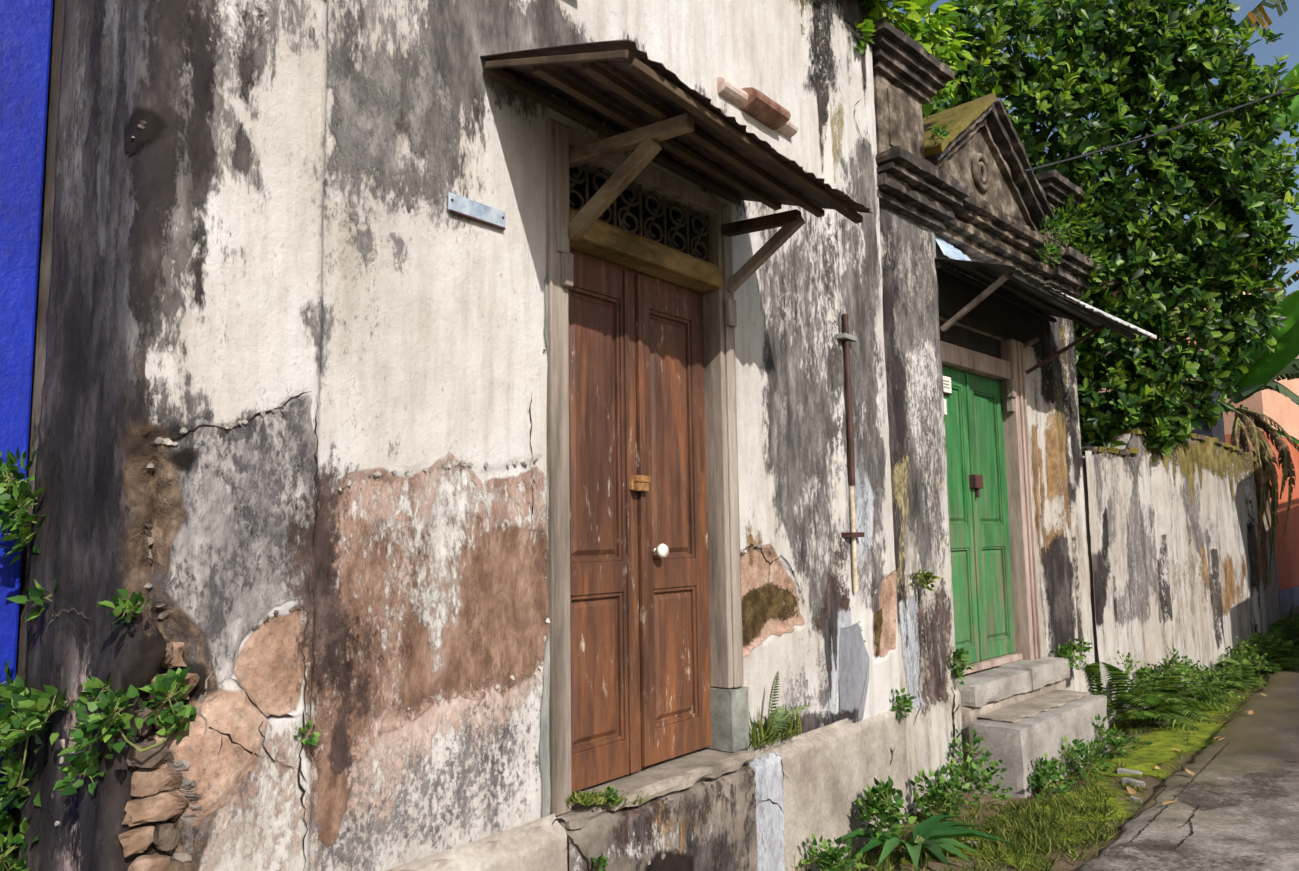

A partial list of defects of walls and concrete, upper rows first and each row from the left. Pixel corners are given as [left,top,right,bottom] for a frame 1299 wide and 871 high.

crack [150,391,318,870]
leakage [8,0,623,871]
peeling [118,395,550,871]
spalling [646,848,693,871]
flaking render [740,544,805,658]
leakage [736,0,953,739]
leakage [1034,315,1275,687]
crack [1115,739,1233,856]